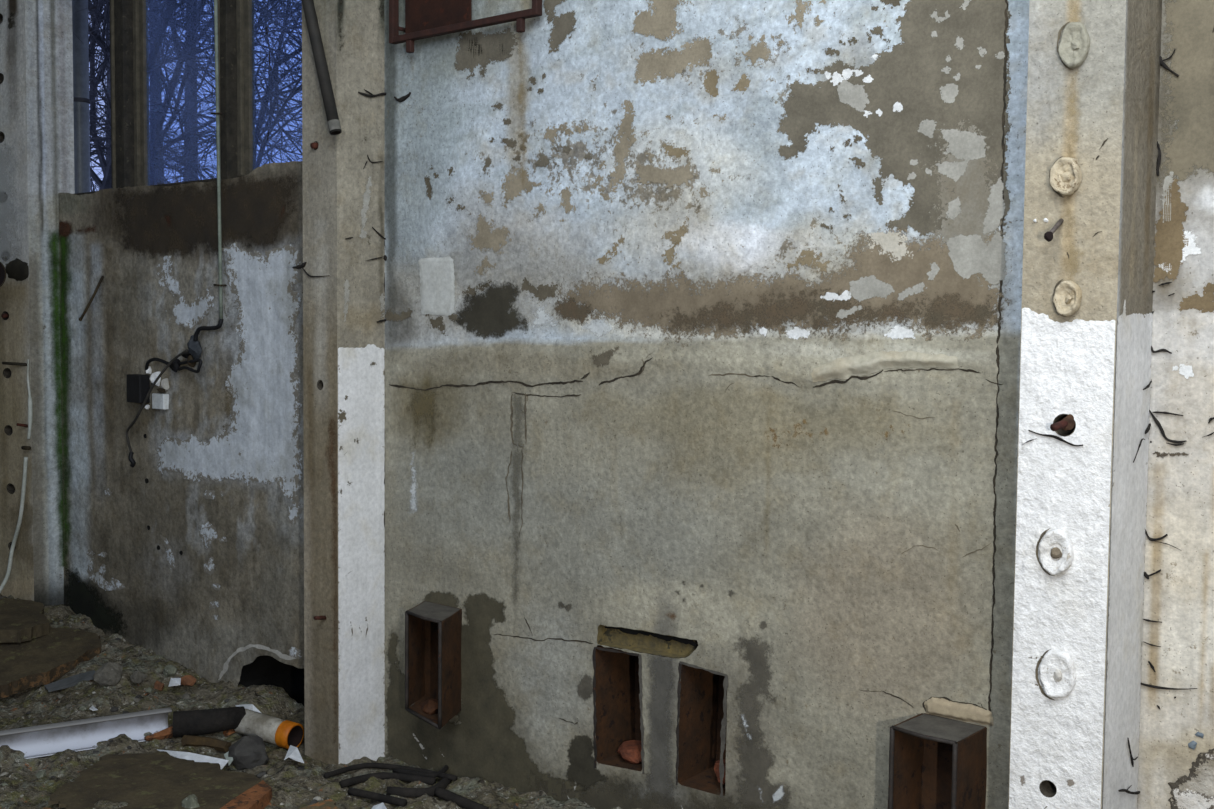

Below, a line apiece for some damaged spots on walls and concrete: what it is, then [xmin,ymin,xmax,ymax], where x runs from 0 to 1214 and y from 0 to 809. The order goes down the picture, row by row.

leakage [114,175,296,257]
peeling [543,0,578,54]
peeling [424,99,724,296]
peeling [630,0,716,87]
peeling [775,0,1013,237]
crack [1000,0,1009,237]
peeling [1153,0,1214,282]
peeling [1177,283,1214,313]
leakage [49,233,127,635]
crack [384,353,653,538]
leakage [385,392,790,809]
crack [708,280,1003,711]